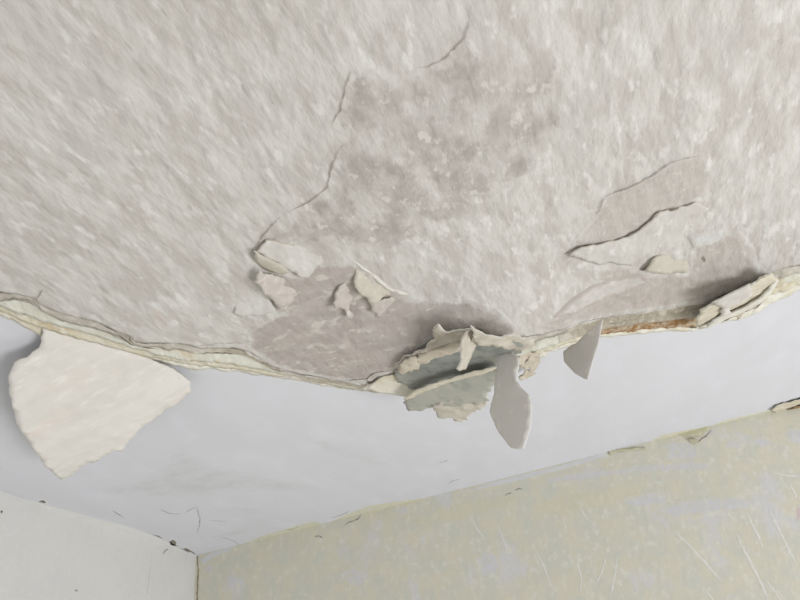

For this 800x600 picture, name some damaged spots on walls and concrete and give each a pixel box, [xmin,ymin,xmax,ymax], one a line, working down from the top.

crack [297,158,336,208]
crack [597,165,668,214]
peeling [0,28,760,479]
spalling [721,266,800,323]
rust [558,300,715,343]
leakage [190,345,378,393]